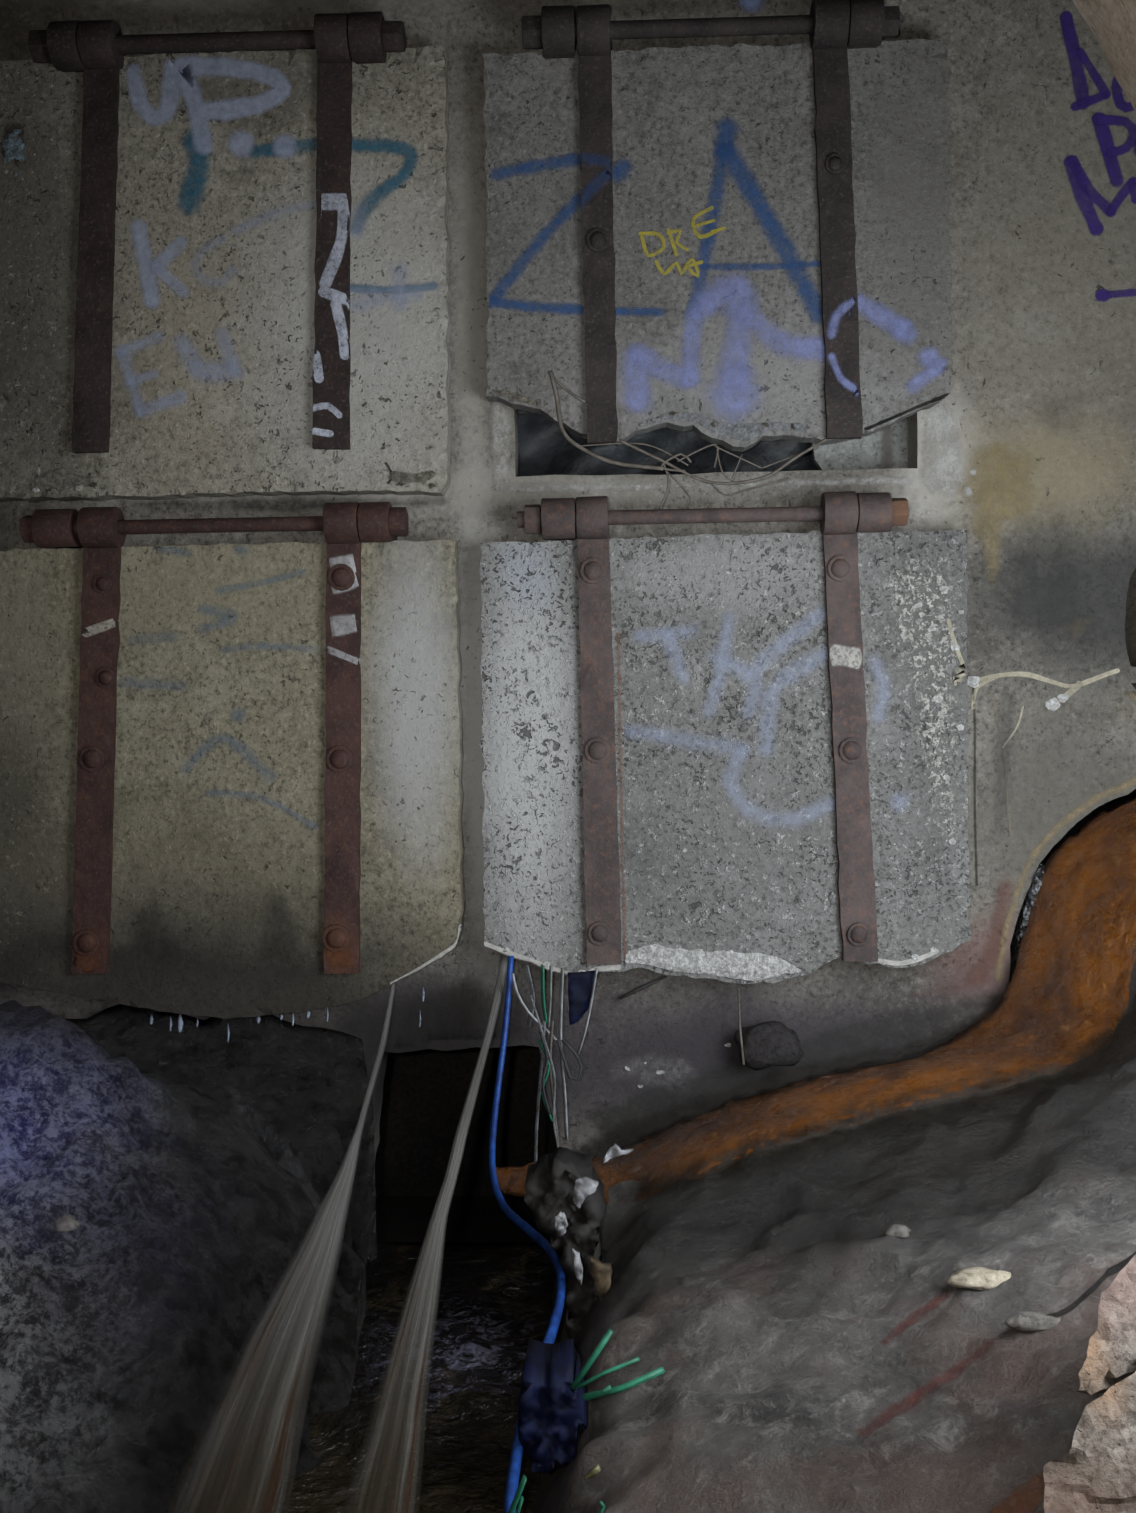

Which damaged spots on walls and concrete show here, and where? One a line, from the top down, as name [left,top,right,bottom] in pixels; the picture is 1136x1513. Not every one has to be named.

peeling [492,405,976,503]
spalling [484,942,801,981]